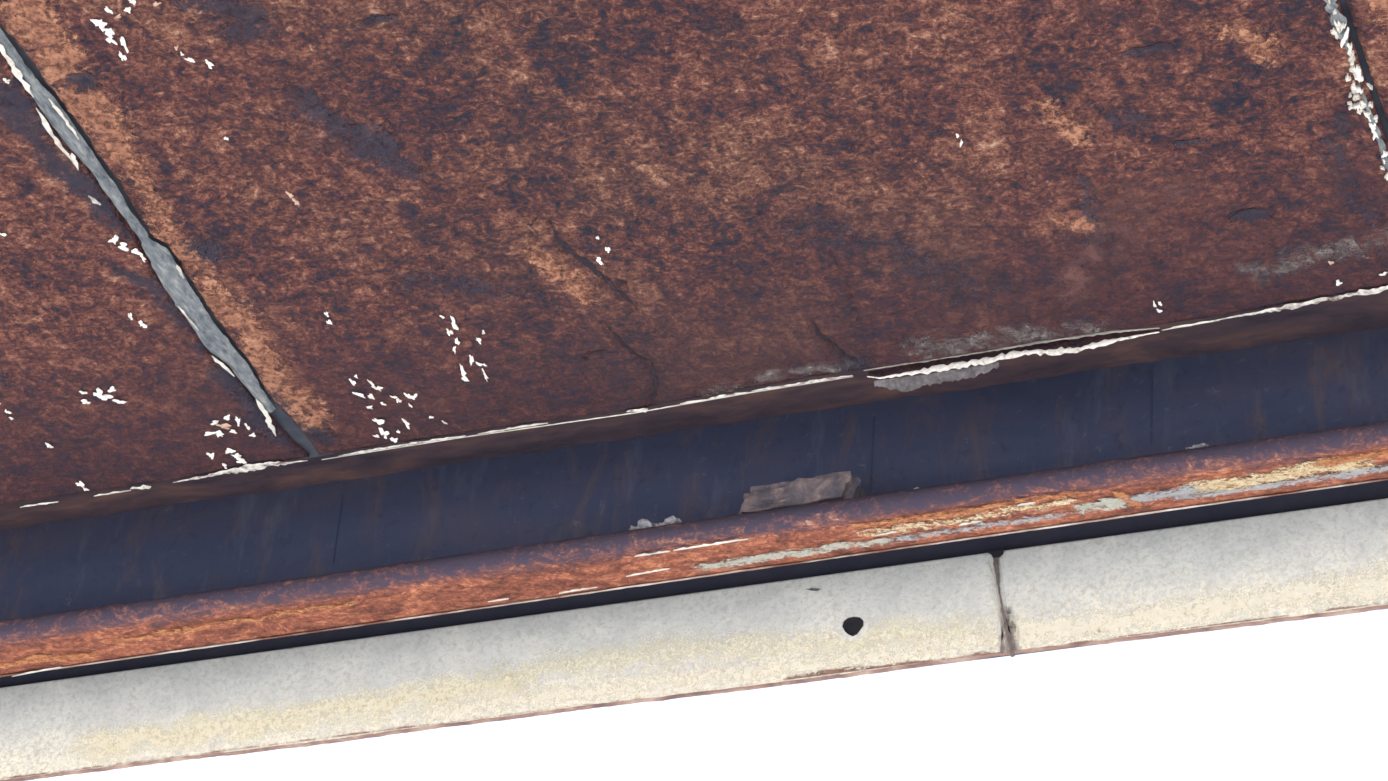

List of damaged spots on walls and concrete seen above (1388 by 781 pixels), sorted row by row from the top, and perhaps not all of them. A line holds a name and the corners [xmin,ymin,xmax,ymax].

peeling [90,0,136,61]
corrosion [1205,23,1280,64]
corrosion [1364,0,1388,25]
corrosion [1038,98,1092,146]
corrosion [0,0,329,430]
corrosion [1045,180,1194,304]
corrosion [525,247,596,305]
peeling [173,261,1388,483]
corrosion [852,492,1089,527]
peeling [695,465,1388,571]
corrosion [113,600,356,644]
crack [987,549,1018,657]